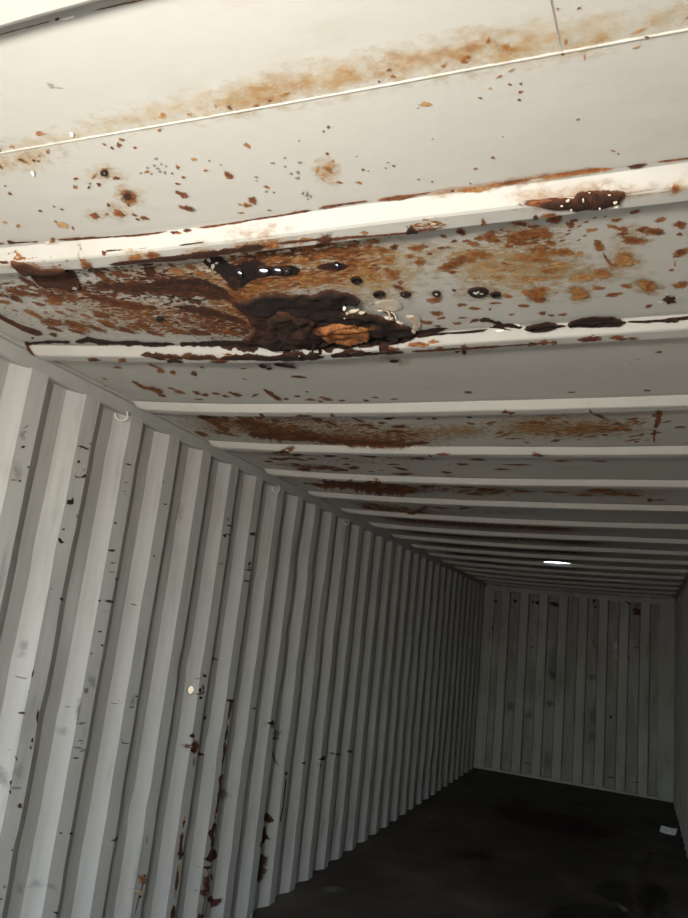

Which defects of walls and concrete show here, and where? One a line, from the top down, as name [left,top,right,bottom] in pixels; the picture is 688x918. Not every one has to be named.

corrosion [395,32,567,101]
corrosion [73,168,119,189]
corrosion [90,190,149,221]
corrosion [175,165,194,212]
corrosion [0,210,688,341]
peeling [374,299,421,334]
corrosion [132,381,242,400]
corrosion [253,389,346,402]
corrosion [181,409,685,584]
corrosion [170,816,188,918]
corrosion [195,775,228,918]
corrosion [257,813,274,882]